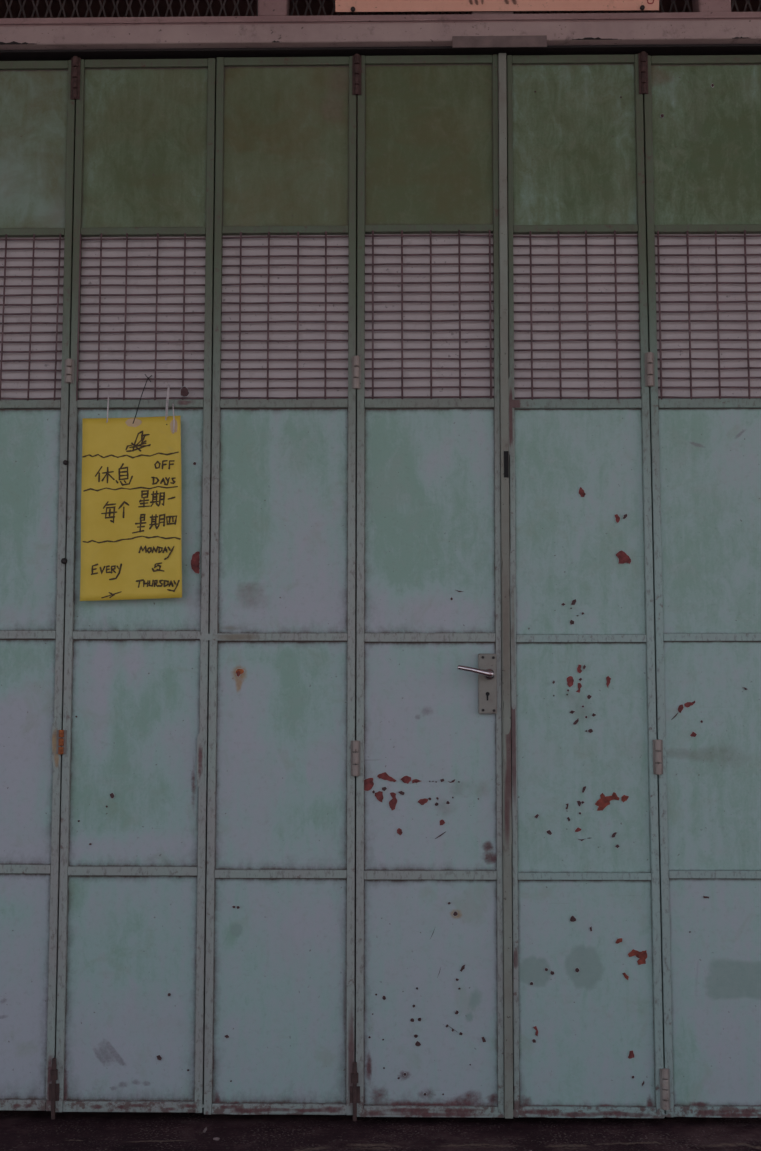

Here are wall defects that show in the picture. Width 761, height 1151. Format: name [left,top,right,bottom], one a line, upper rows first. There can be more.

peeling [615,550,631,564]
rust [226,660,252,697]
peeling [552,664,596,733]
peeling [671,700,696,720]
peeling [364,772,460,811]
peeling [565,786,629,841]
peeling [615,938,648,965]